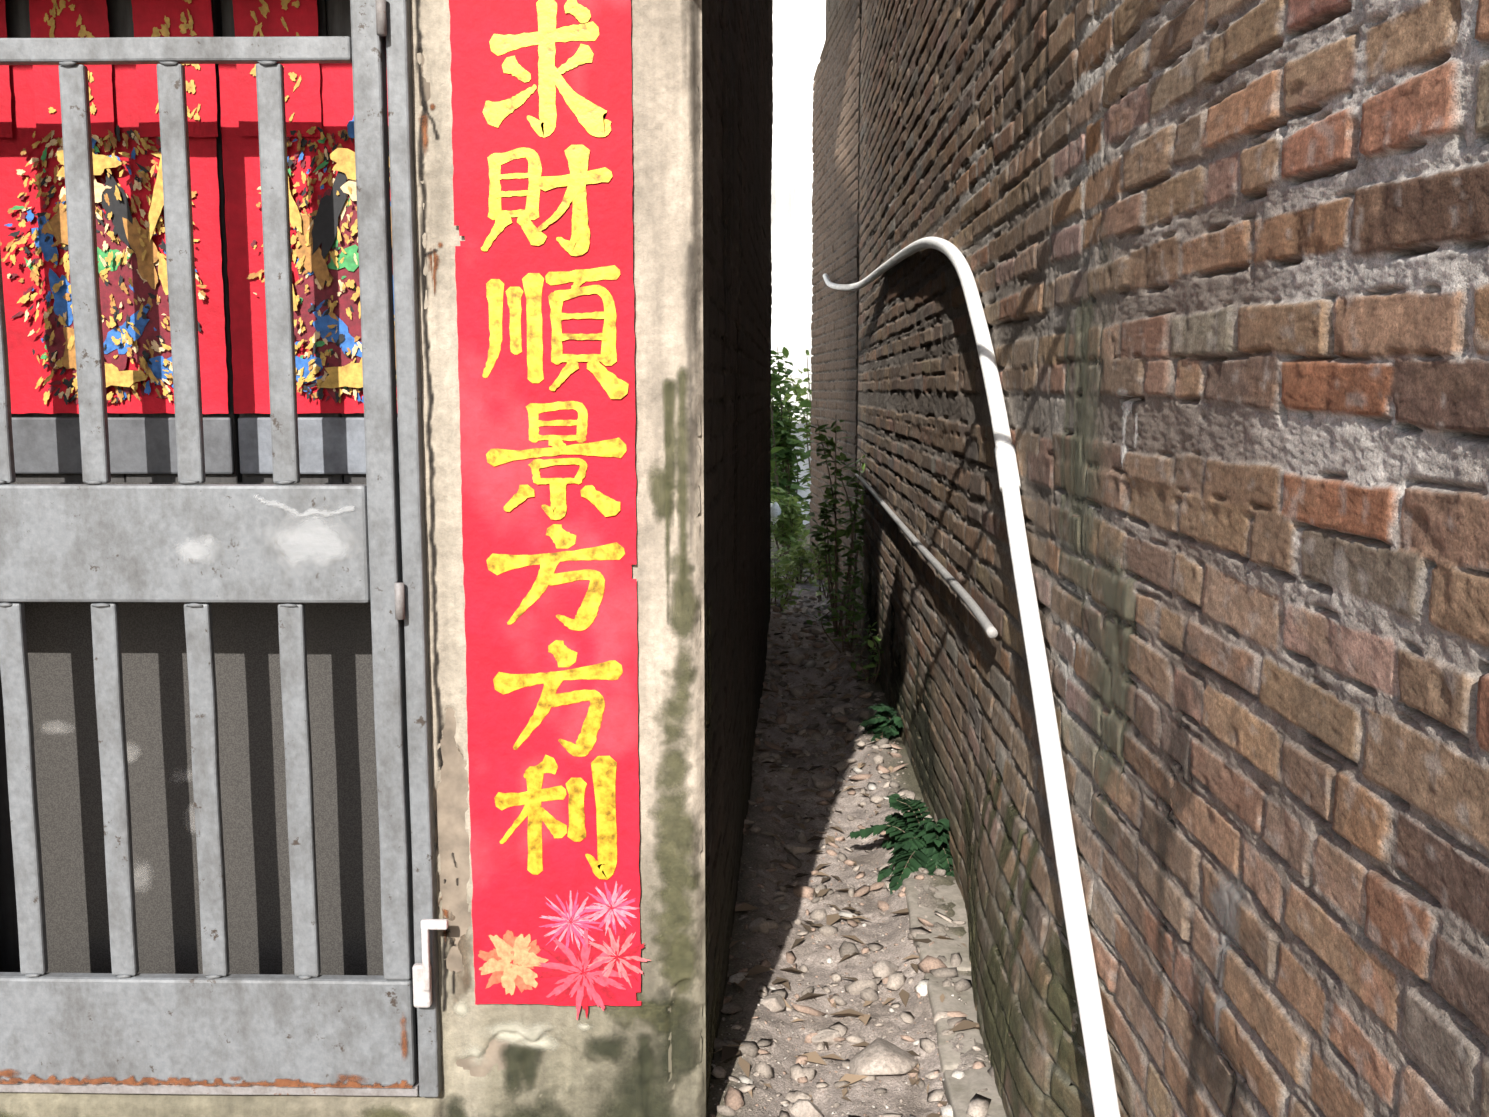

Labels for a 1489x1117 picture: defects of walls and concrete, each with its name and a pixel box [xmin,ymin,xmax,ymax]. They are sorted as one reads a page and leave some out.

leakage [663,369,687,584]
corrosion [0,1069,413,1088]
leakage [503,1045,540,1093]
leakage [639,1037,653,1117]